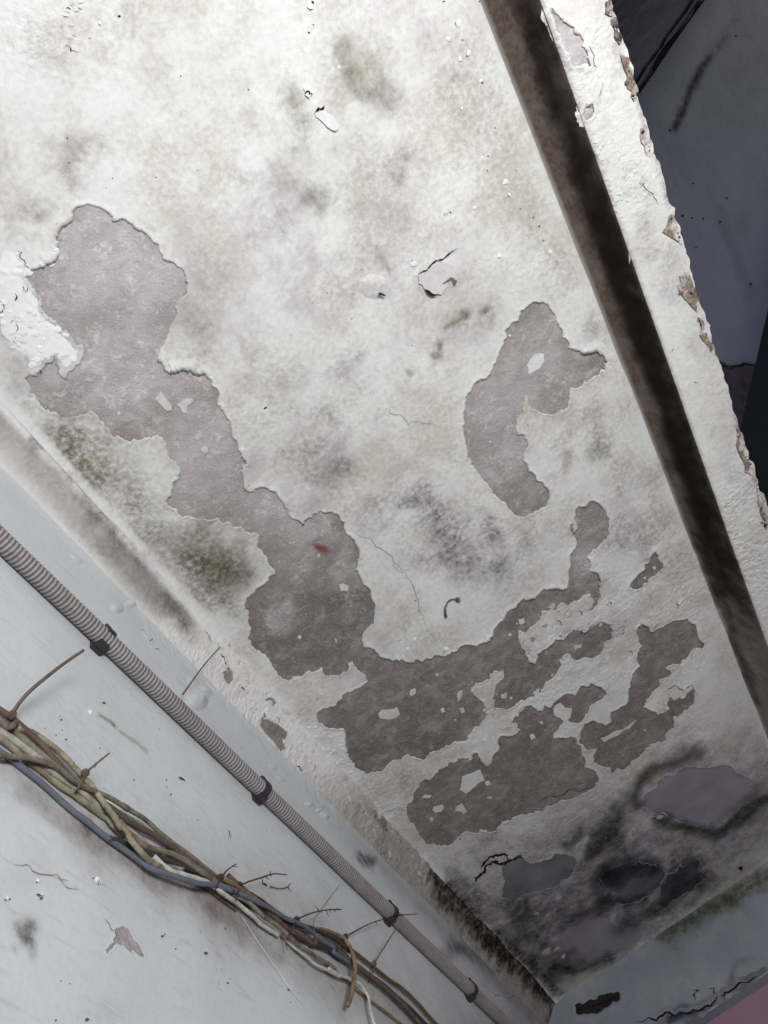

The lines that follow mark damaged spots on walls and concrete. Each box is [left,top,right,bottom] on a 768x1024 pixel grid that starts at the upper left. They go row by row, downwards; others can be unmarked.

spalling [605,0,639,101]
spalling [640,128,654,157]
peeling [575,95,639,263]
peeling [0,199,708,885]
leakage [564,809,623,858]
peeling [641,753,756,827]
leakage [656,796,768,836]
crack [474,853,524,882]
peeling [103,922,147,961]
leakage [434,875,612,1017]
spalling [569,985,626,1022]
crack [635,966,768,1022]